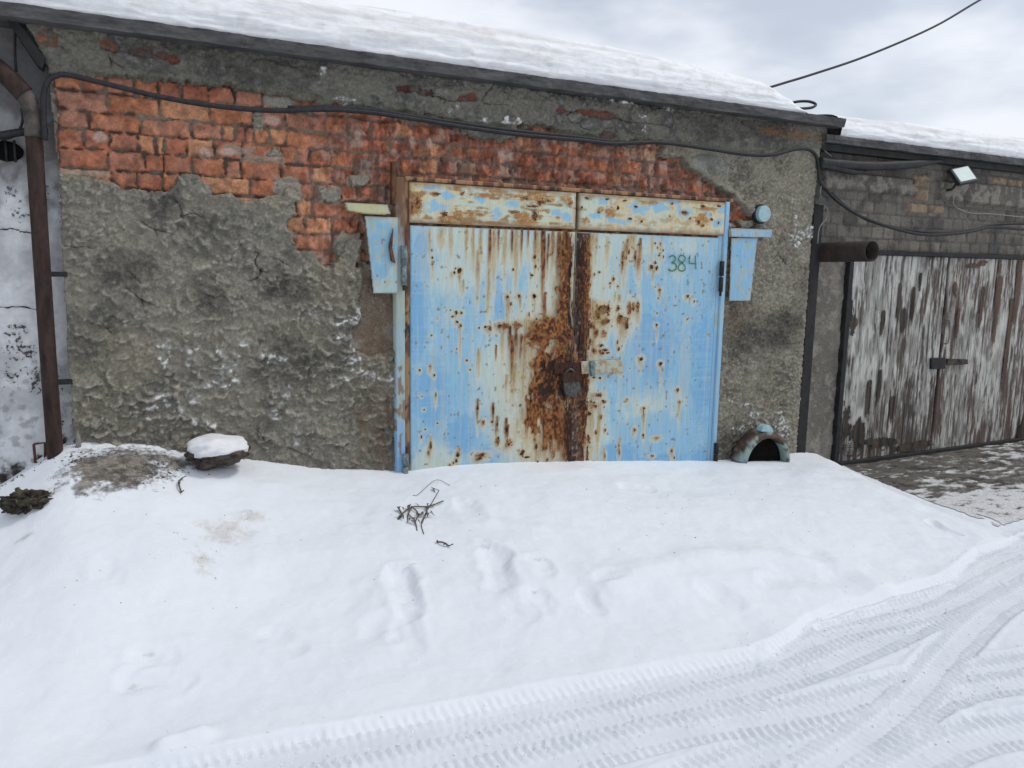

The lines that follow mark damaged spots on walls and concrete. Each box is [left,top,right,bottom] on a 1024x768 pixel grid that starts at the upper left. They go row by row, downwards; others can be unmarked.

flaking render [51,75,754,357]
rust [412,192,441,216]
rust [440,190,721,462]
peeling [880,272,922,338]
peeling [953,282,961,339]
peeling [963,260,1023,391]
peeling [839,369,933,457]